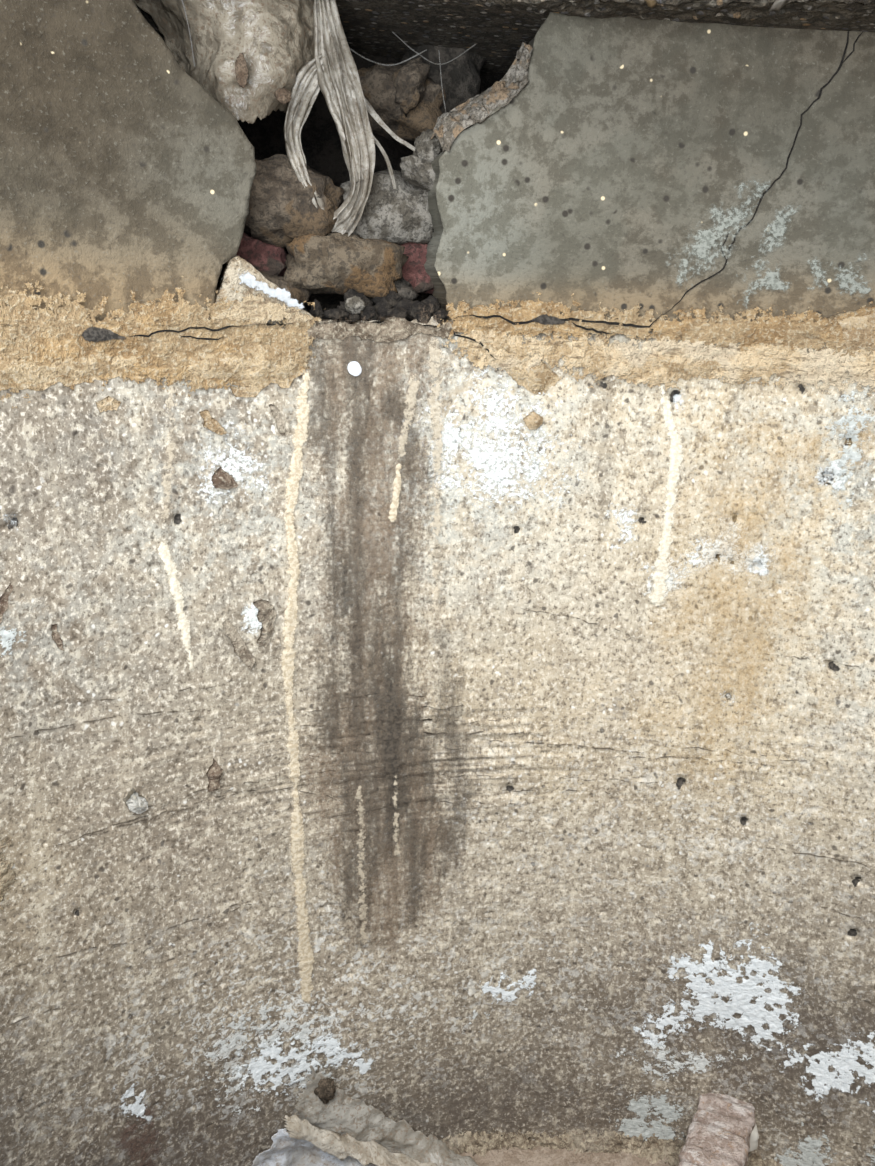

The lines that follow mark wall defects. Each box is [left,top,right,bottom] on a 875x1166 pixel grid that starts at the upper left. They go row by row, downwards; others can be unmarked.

crack [453,31,863,359]
spalling [0,831,18,910]
leakage [196,336,581,1119]
leakage [609,922,875,1142]